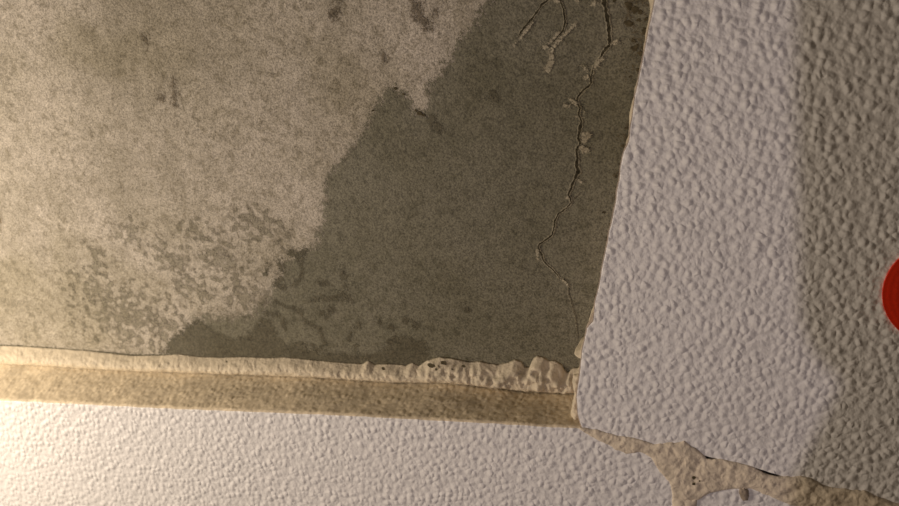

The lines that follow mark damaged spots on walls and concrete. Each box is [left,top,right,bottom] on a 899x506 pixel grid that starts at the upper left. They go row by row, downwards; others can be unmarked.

leakage [60,0,650,371]
crack [512,0,618,338]
spalling [611,120,629,200]
spalling [613,0,650,82]